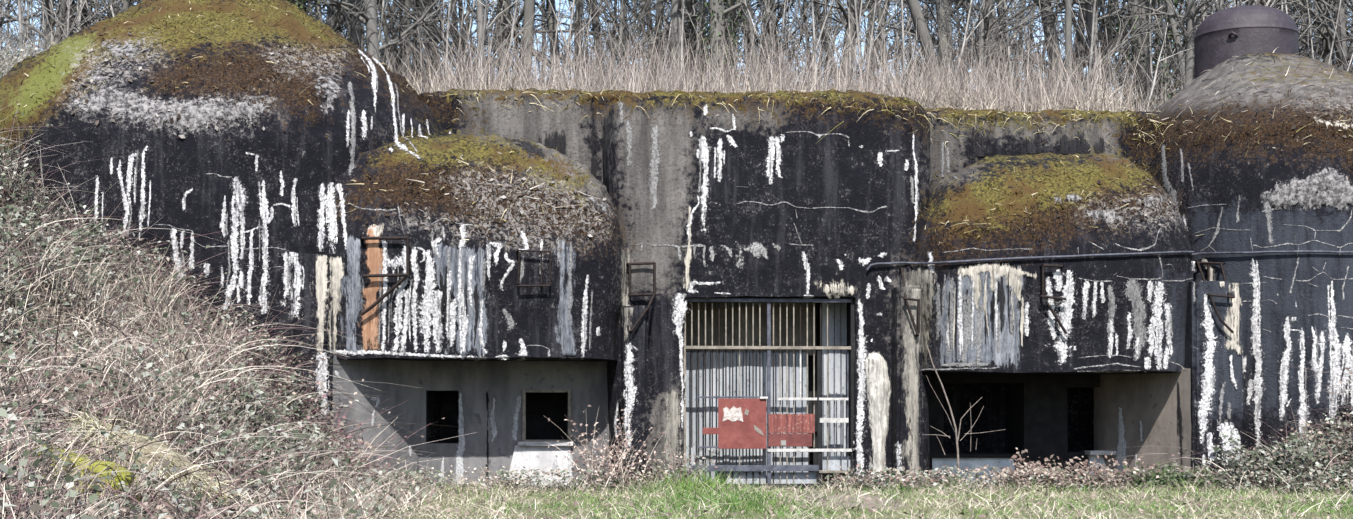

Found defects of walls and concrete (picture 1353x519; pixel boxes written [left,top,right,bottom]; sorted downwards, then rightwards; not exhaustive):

leakage [94,146,151,244]
corrosion [358,223,384,351]
leakage [170,49,600,433]
leakage [766,134,785,185]
leakage [802,251,814,299]
leakage [877,134,919,242]
leakage [1013,131,1106,156]
leakage [1161,146,1193,230]
leakage [1262,200,1274,244]
leakage [614,249,638,450]
leakage [836,252,1173,482]
leakage [1177,258,1353,468]